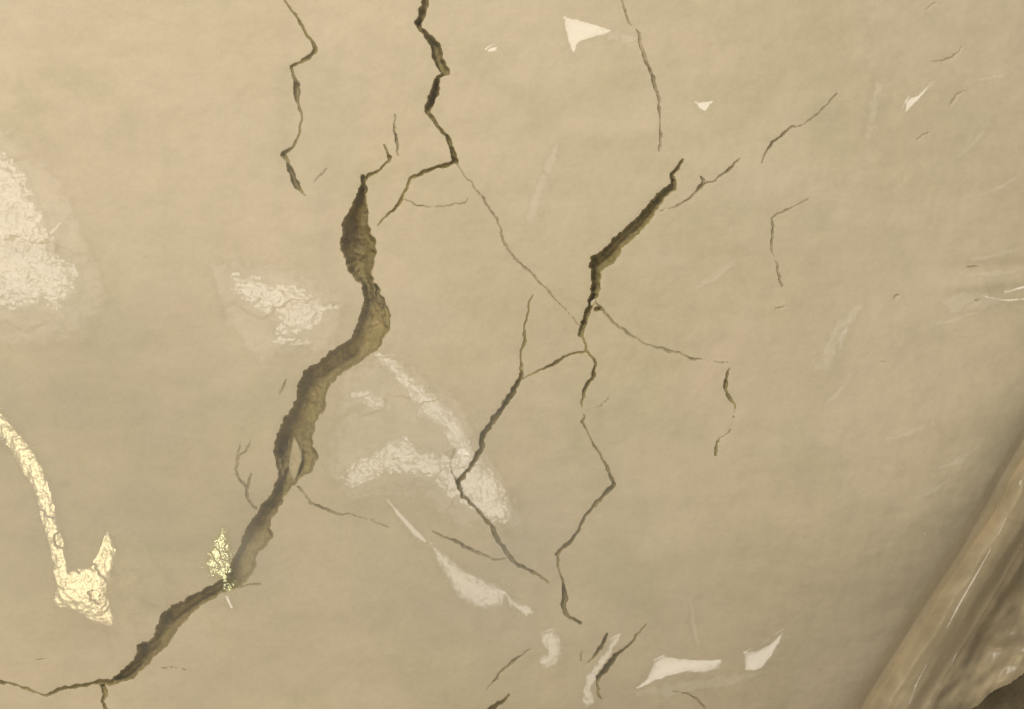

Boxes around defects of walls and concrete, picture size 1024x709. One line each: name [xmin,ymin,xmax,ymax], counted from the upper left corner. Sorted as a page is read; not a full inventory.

crack [761,93,838,164]
crack [770,198,809,287]
crack [0,0,740,709]